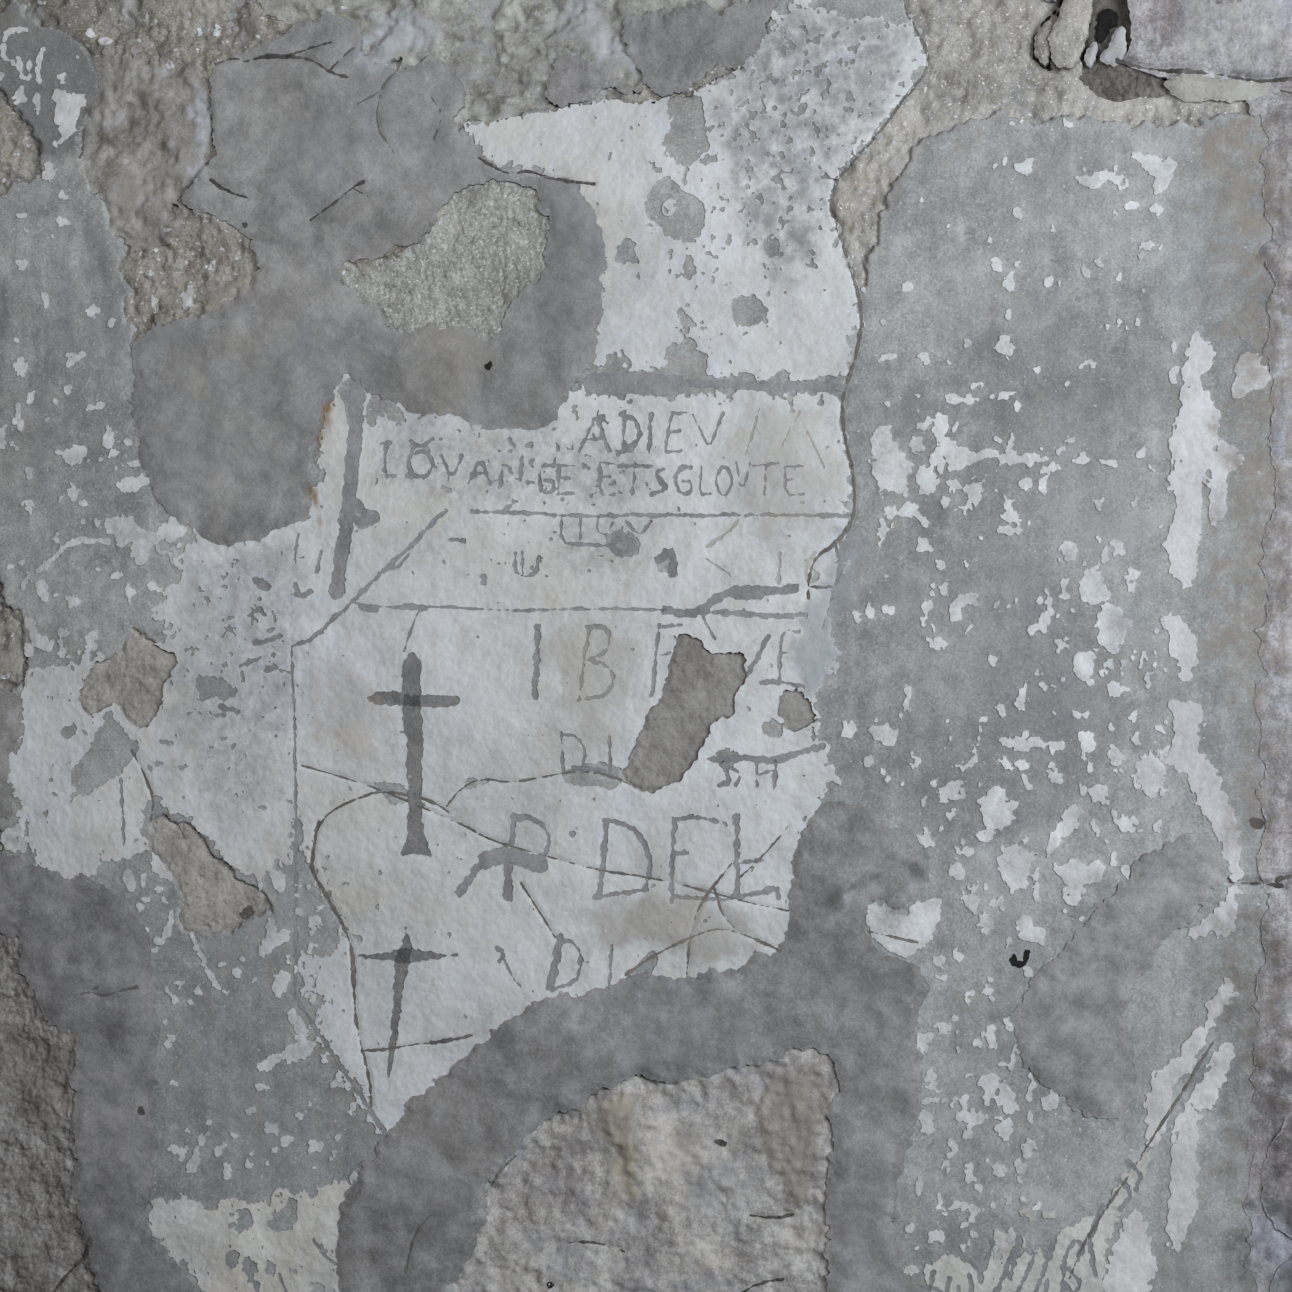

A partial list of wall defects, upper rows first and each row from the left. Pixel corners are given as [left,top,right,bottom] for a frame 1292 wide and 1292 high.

peeling [0,0,1249,381]
crack [1115,57,1292,94]
peeling [868,382,1118,650]
peeling [1136,331,1245,589]
peeling [0,374,853,1134]
peeling [841,686,912,746]
peeling [866,897,964,981]
peeling [916,536,1245,940]
crack [1230,875,1292,888]
spalling [0,933,101,1292]
peeling [167,1107,341,1180]
spalling [455,1047,840,1292]